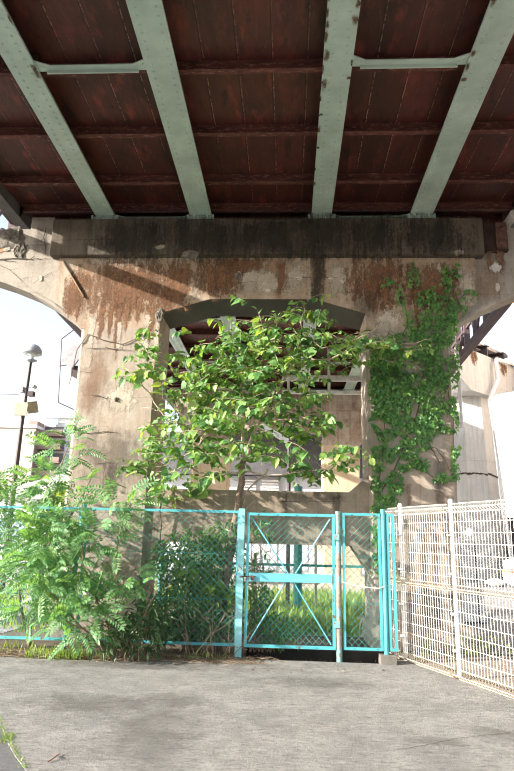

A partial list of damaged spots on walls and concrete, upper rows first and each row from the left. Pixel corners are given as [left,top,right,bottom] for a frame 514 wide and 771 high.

spalling [0,226,28,258]
crack [0,229,53,282]
damp [87,212,475,300]
rust [62,258,287,359]
rust [345,258,461,330]
crack [459,471,498,479]